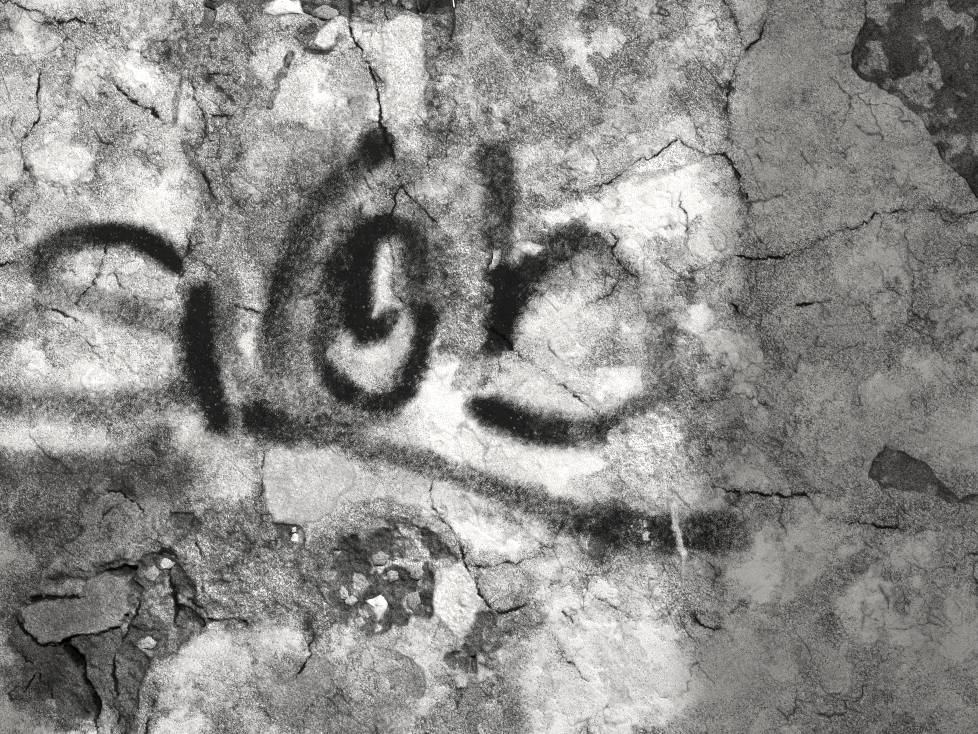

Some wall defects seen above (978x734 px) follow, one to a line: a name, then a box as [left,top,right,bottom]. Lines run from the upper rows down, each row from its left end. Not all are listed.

crack [21,69,41,178]
crack [115,85,163,122]
crack [133,49,229,242]
crack [349,15,439,266]
crack [588,134,751,210]
crack [720,0,766,112]
crack [44,307,78,322]
crack [54,236,108,294]
flaking render [5,448,547,734]